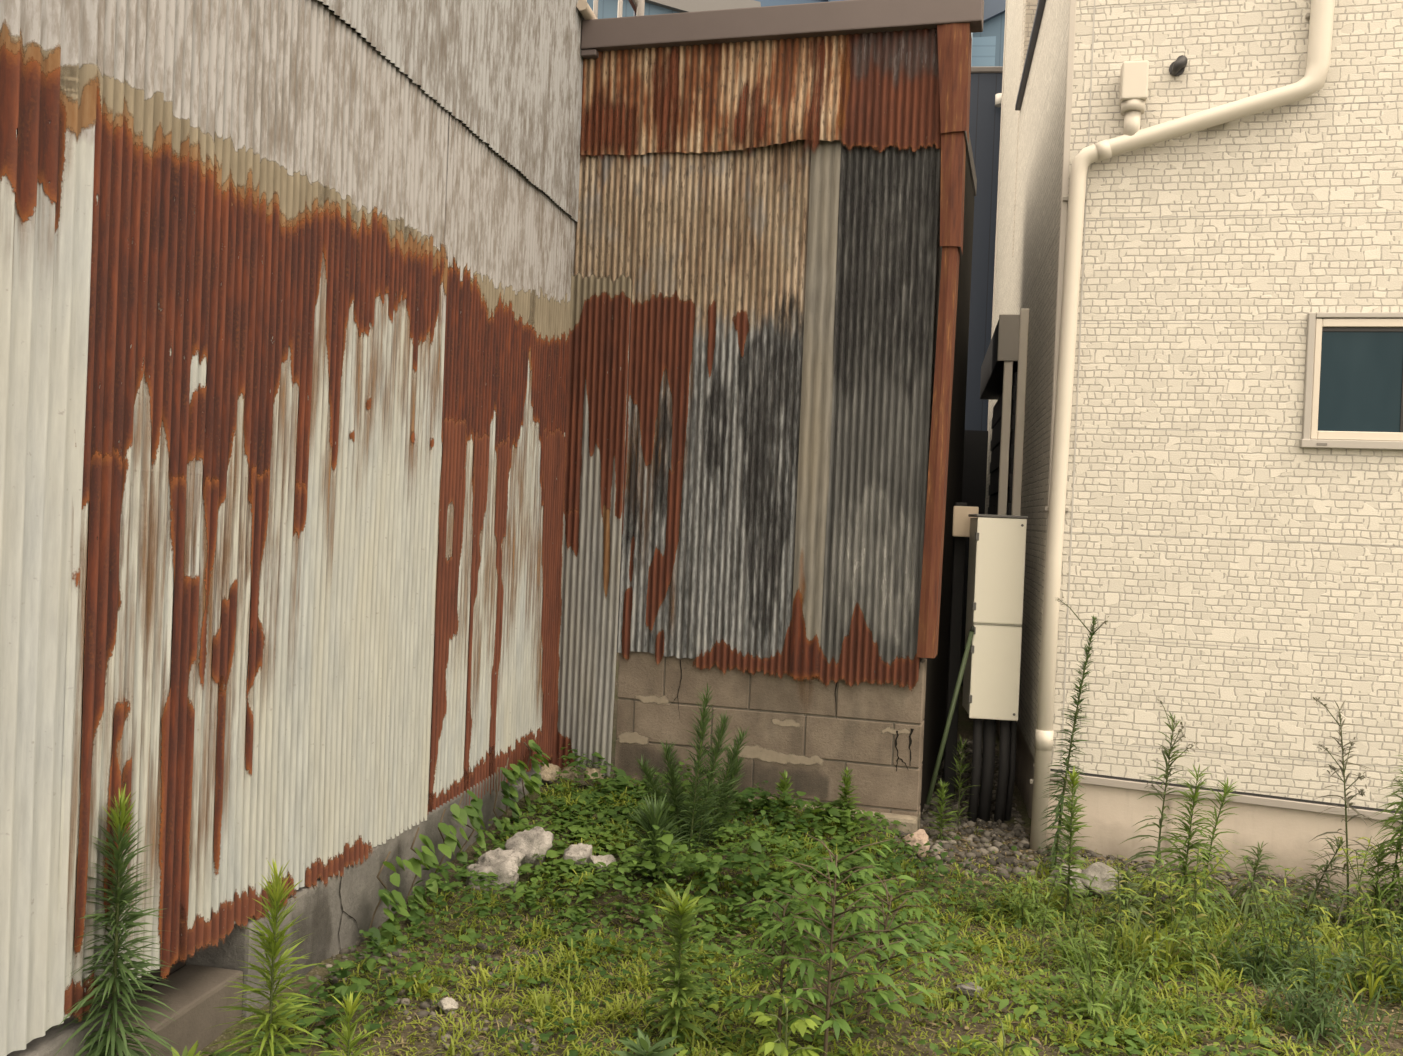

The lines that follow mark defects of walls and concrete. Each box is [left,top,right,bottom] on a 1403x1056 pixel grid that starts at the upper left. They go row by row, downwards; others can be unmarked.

rust [0,42,67,231]
rust [652,46,679,152]
rust [734,82,766,151]
rust [807,28,941,153]
leakage [704,293,803,629]
rust [68,86,749,979]
rust [693,581,919,692]
rust [64,969,99,1022]